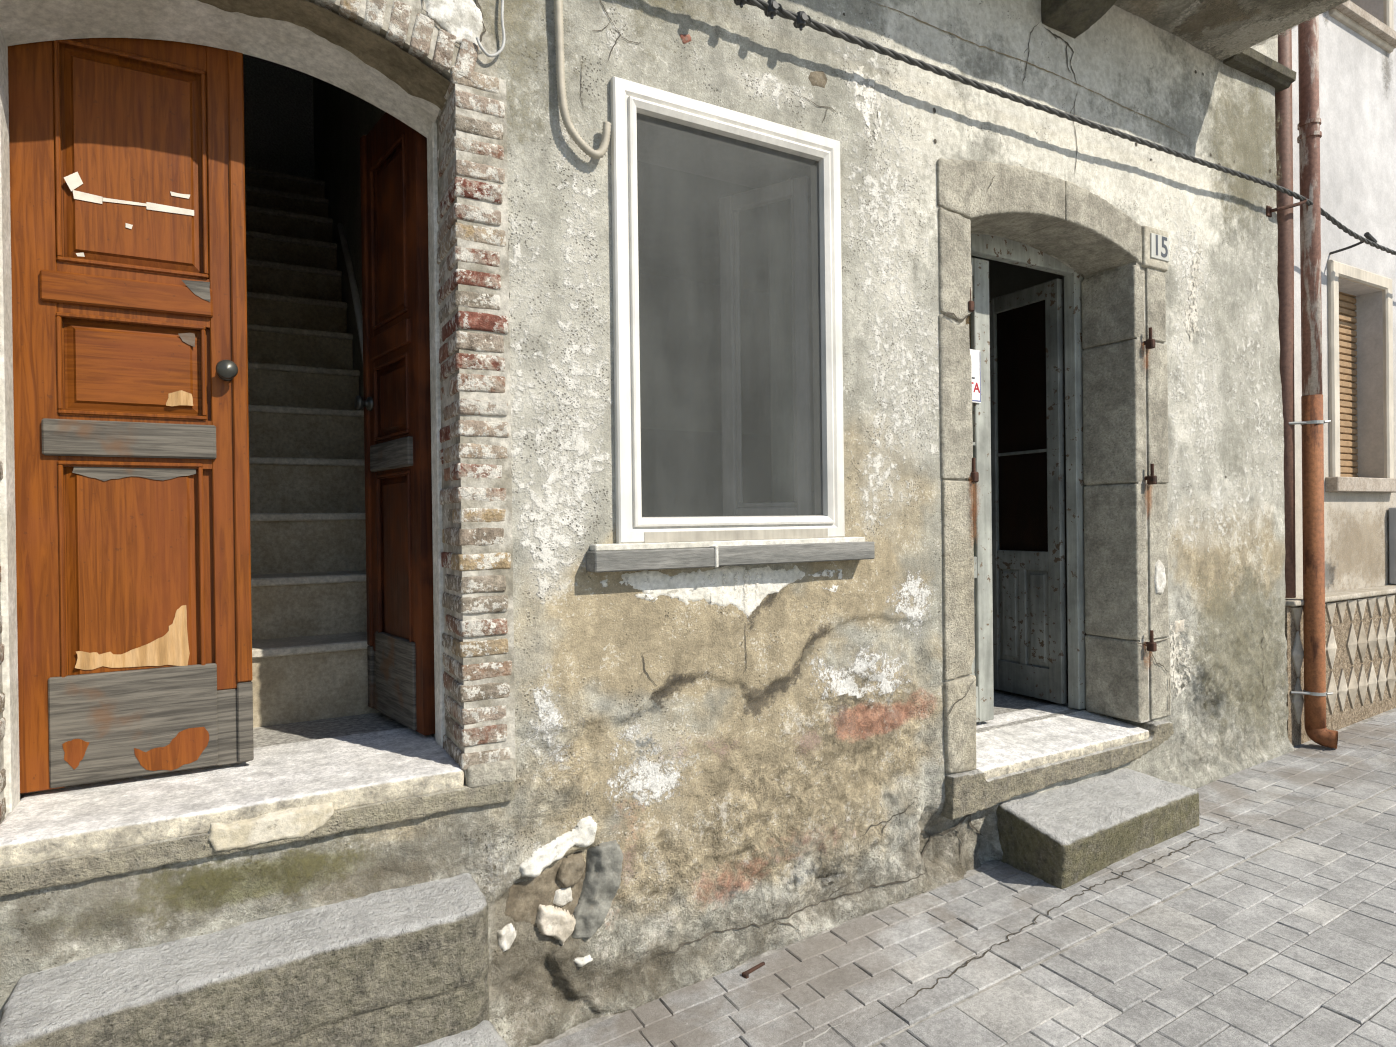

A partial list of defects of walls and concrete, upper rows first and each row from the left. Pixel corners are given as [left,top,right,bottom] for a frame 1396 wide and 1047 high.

crack [874,2,1183,170]
flaking render [600,565,842,618]
flaking render [497,816,623,967]
crack [629,803,983,971]